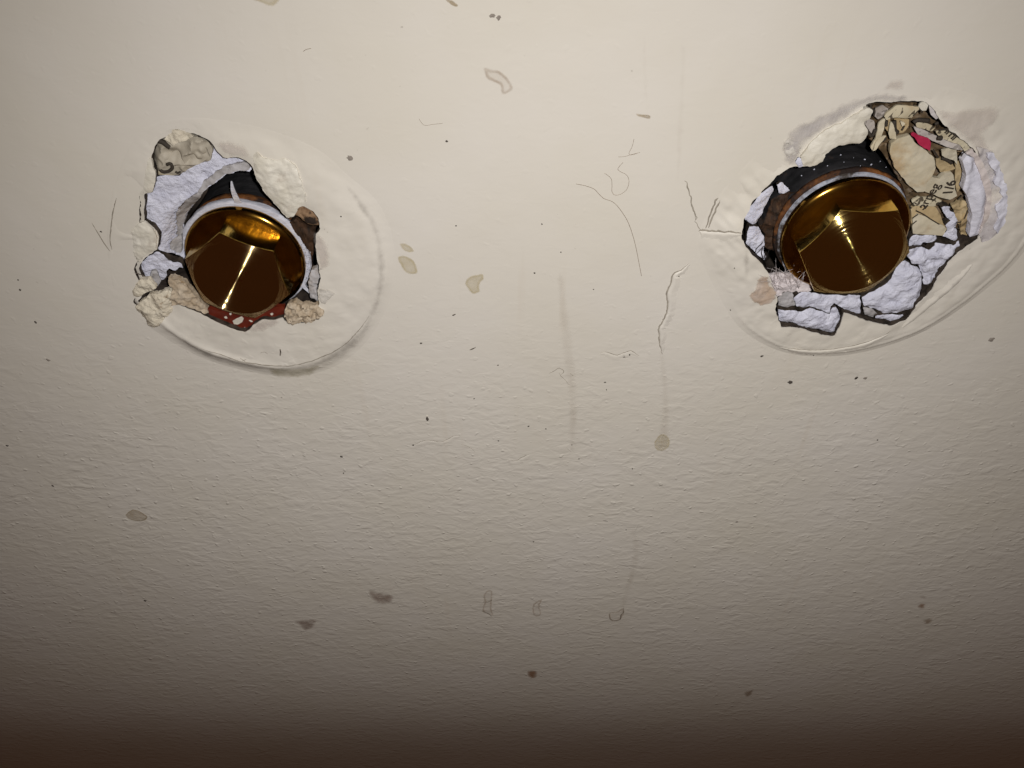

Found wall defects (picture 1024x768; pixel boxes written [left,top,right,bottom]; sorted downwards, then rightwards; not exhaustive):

peeling [787,105,854,160]
spalling [866,136,894,175]
spalling [133,145,253,305]
peeling [208,238,326,328]
crack [600,264,690,361]
crack [685,181,742,241]
spalling [741,183,792,275]
spalling [775,201,973,332]